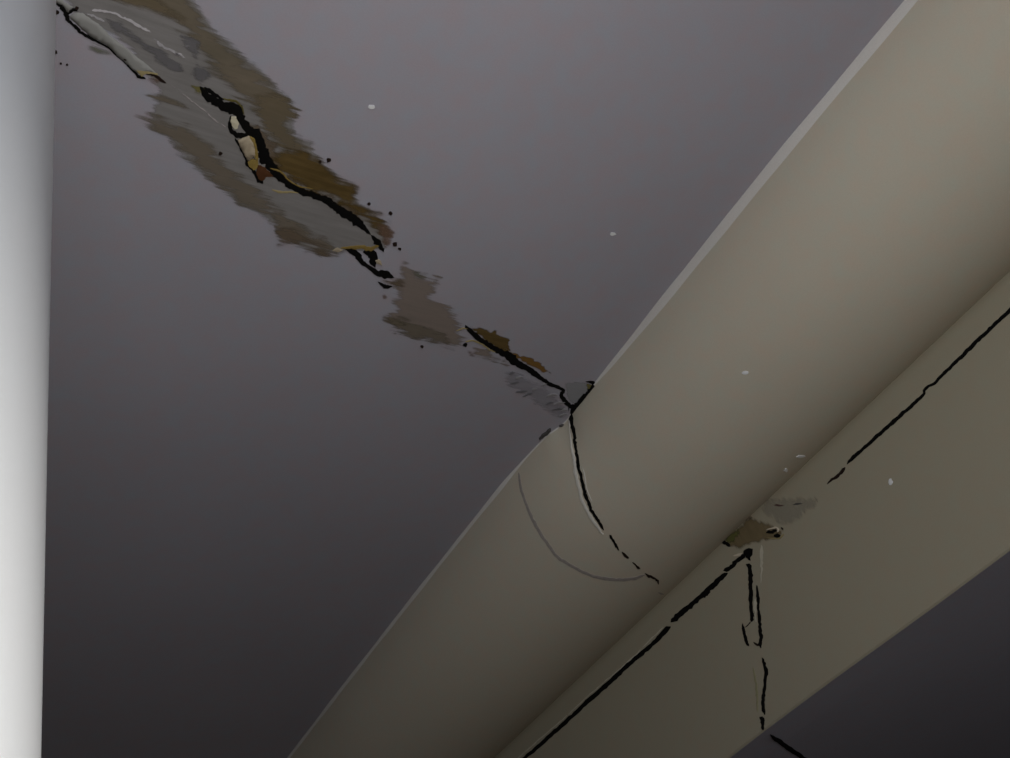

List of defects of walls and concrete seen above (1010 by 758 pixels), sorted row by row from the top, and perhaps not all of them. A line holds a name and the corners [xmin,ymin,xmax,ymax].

peeling [56,0,185,77]
damp [68,0,401,257]
flaking render [230,116,273,181]
damp [383,263,464,348]
crack [457,325,806,758]
flaking render [722,517,784,557]